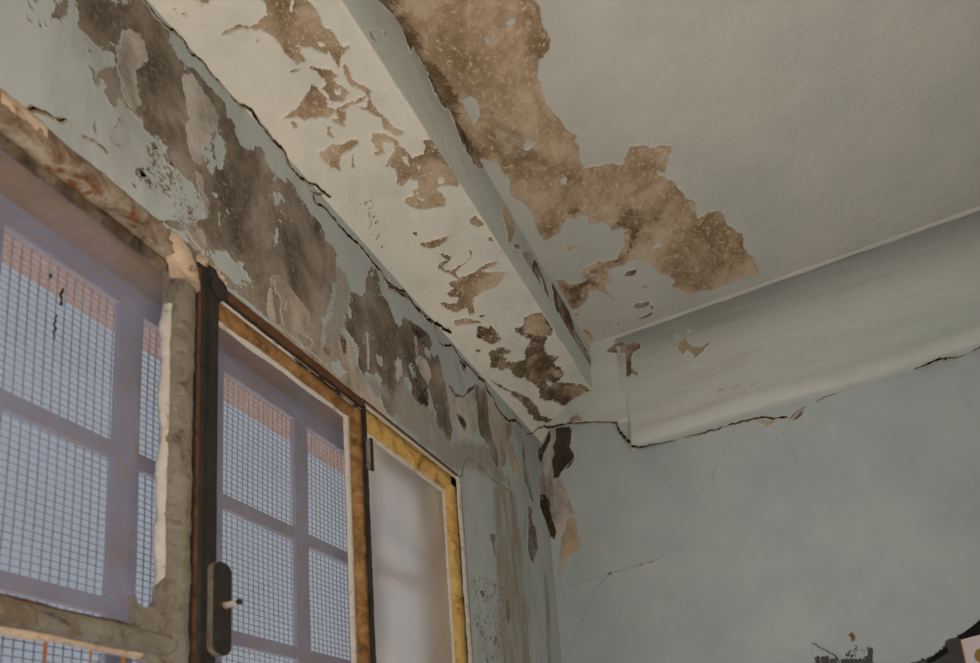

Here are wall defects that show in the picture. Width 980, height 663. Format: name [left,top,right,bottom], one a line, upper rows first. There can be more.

peeling [0,89,48,137]
crack [26,104,108,154]
peeling [23,0,759,663]
crack [143,0,855,534]
crack [879,346,980,382]
crack [367,410,512,663]